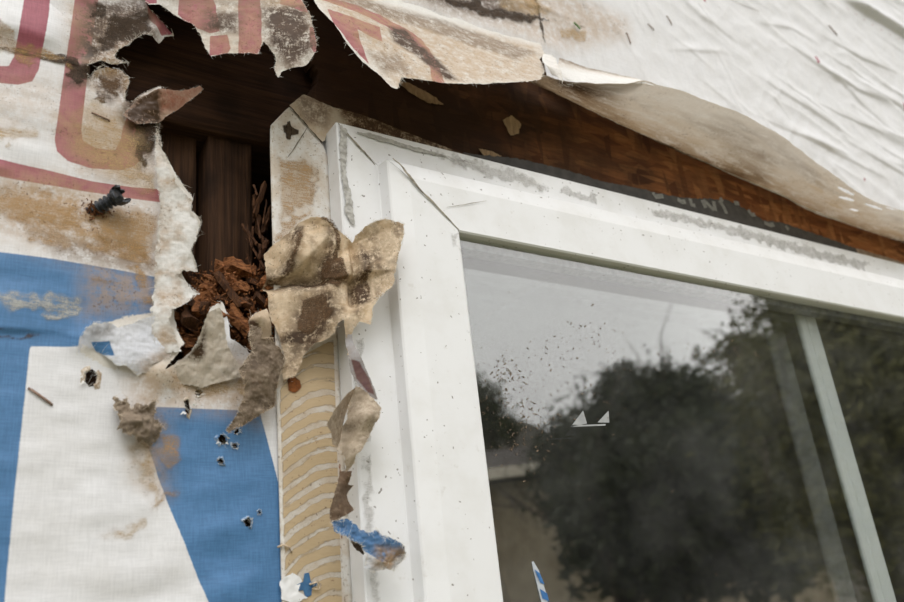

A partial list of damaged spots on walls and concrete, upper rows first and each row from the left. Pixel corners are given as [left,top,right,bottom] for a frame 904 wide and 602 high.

leakage [447,0,548,39]
hole [252,215,272,276]